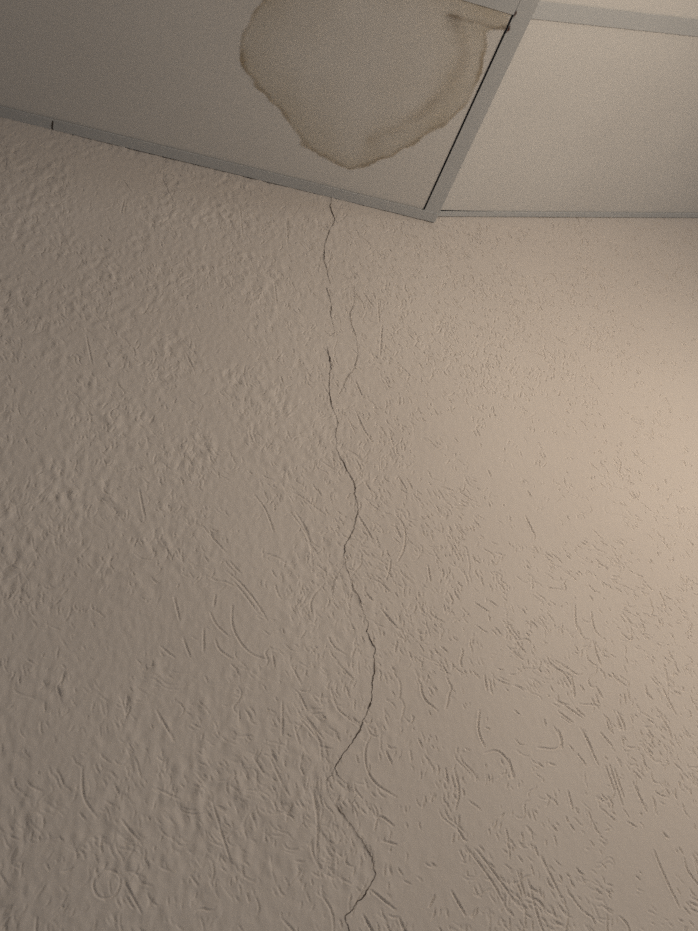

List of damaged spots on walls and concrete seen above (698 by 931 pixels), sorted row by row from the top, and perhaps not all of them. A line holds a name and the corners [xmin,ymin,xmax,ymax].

crack [324,197,335,319]
crack [328,351,376,780]
crack [337,806,376,931]